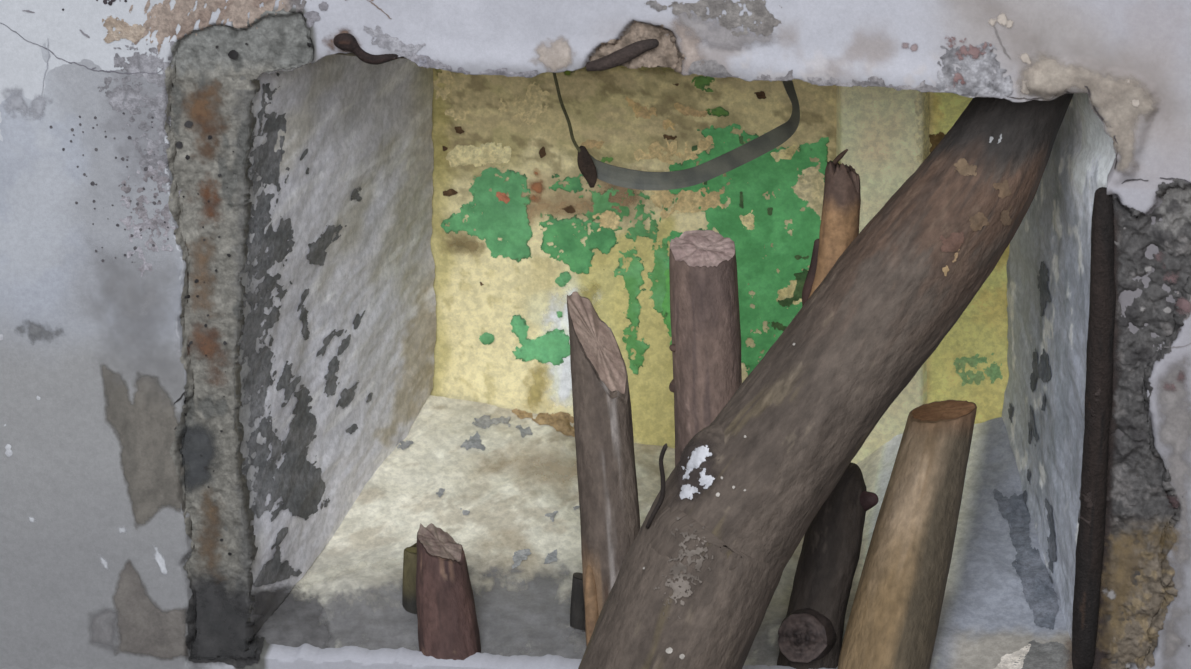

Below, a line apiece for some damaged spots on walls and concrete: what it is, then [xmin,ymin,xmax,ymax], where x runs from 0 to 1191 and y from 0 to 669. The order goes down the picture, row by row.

crack [1,10,163,97]
peeling [589,0,782,92]
peeling [0,0,373,669]
peeling [363,25,830,375]
peeling [1028,348,1051,447]
peeling [1037,261,1052,317]
corrosion [1070,187,1119,669]
spalling [1095,178,1191,669]
peeling [993,469,1072,669]